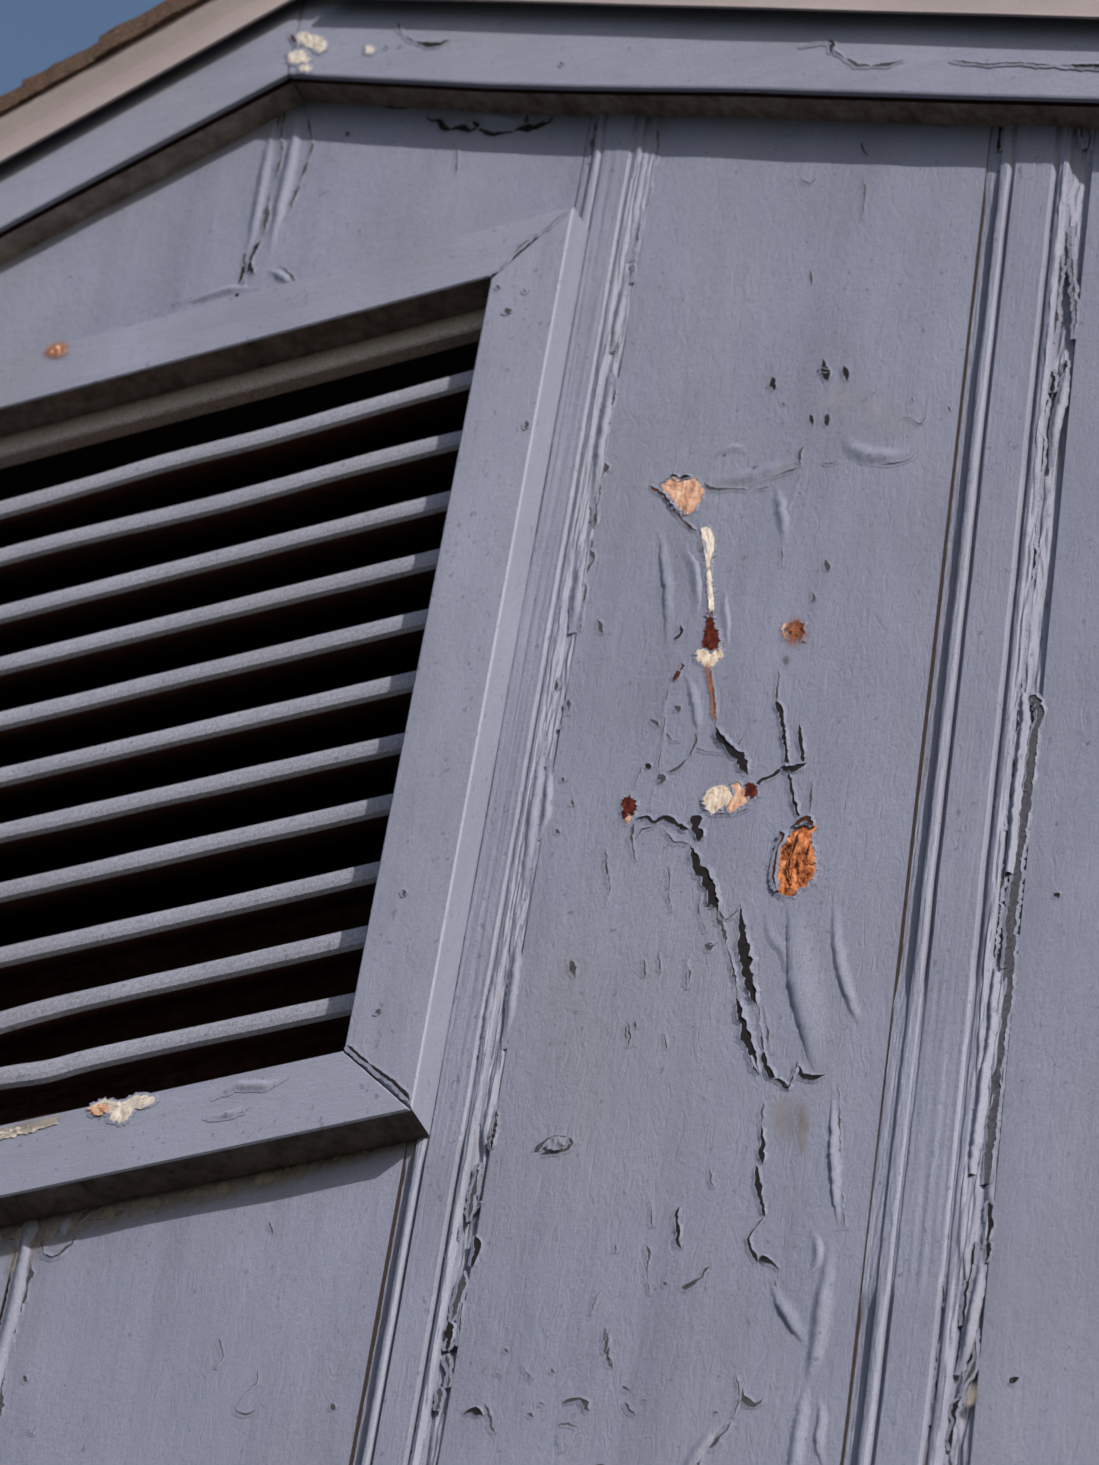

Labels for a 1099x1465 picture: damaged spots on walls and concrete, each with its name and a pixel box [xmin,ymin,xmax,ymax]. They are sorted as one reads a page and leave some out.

crack [216,99,353,290]
rust [44,342,69,358]
peeling [647,473,726,648]
rust [691,608,727,717]
rust [778,618,810,643]
rust [617,791,642,827]
peeling [699,766,783,818]
peeling [763,813,823,901]
crack [923,129,1089,1465]
crack [408,619,826,1465]
peeling [85,1092,161,1127]
crack [0,1258,38,1438]